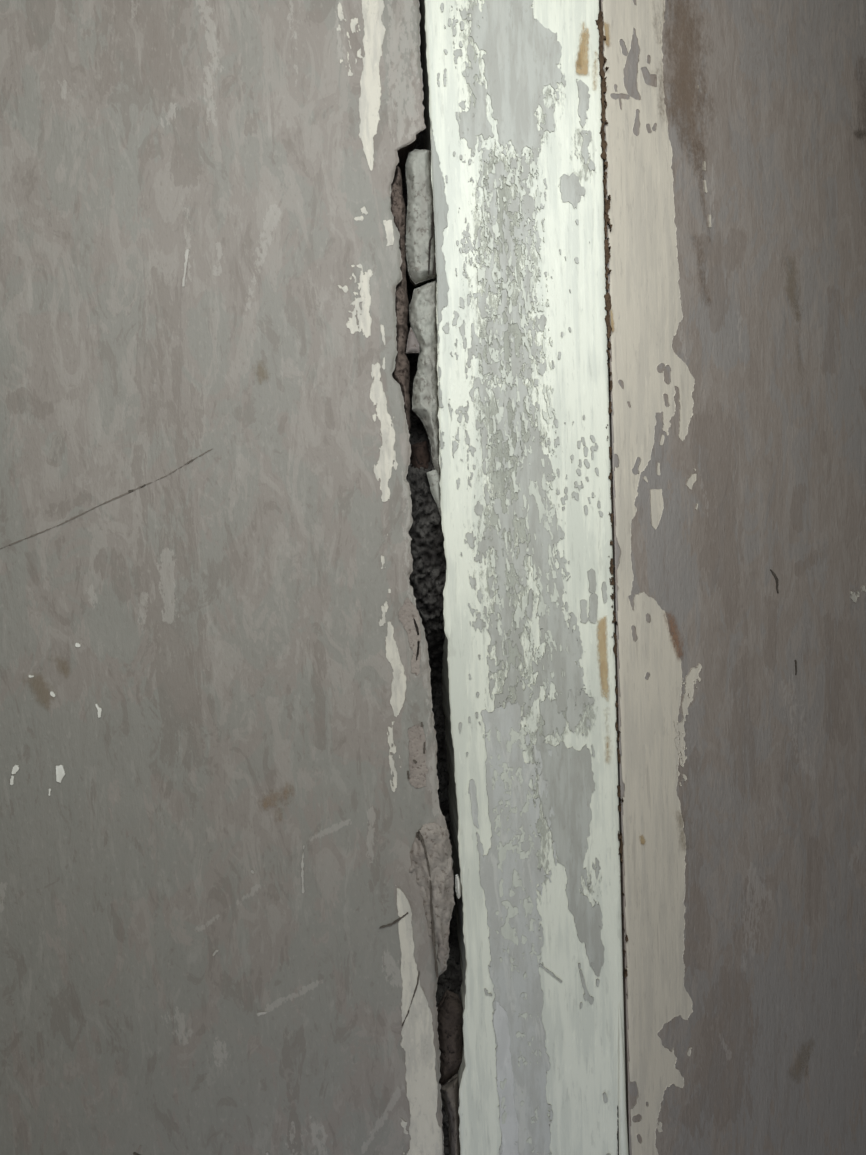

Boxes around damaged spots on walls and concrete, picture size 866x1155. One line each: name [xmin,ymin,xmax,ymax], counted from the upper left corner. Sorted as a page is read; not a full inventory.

peeling [337,0,386,171]
peeling [338,264,398,502]
peeling [383,220,394,246]
peeling [406,327,419,354]
rust [576,10,614,526]
crack [0,449,212,549]
crack [391,131,464,1155]
peeling [427,0,702,1155]
rust [598,540,621,764]